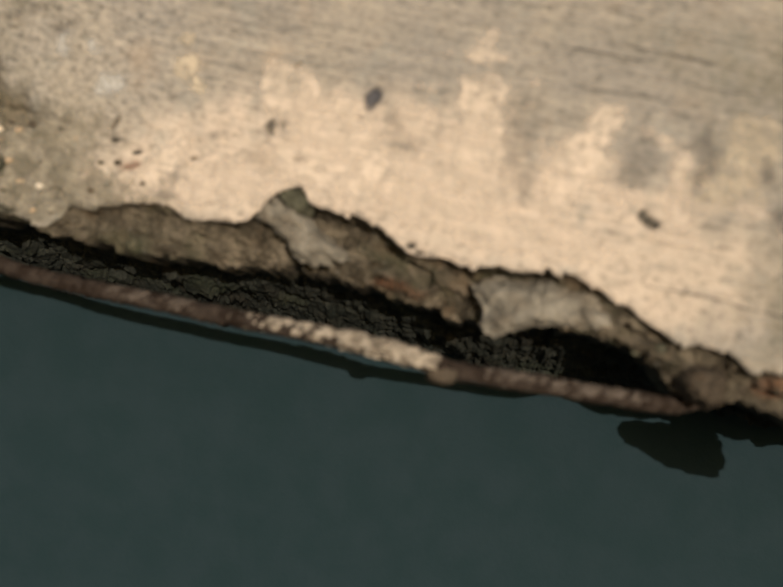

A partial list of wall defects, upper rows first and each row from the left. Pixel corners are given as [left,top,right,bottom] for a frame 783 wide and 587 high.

spalling [0,186,783,427]